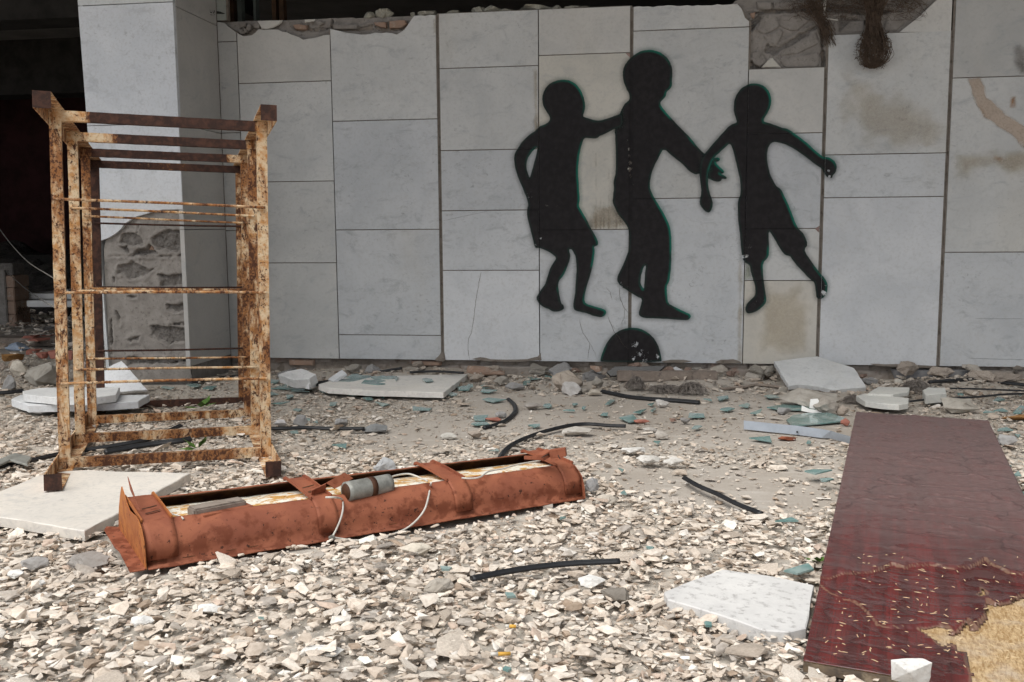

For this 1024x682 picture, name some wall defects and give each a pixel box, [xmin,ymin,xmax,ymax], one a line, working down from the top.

spalling [222,16,413,39]
spalling [733,0,867,69]
spalling [881,0,936,33]
leakage [969,78,1024,146]
spalling [53,195,332,385]
spalling [359,352,780,378]
spalling [846,364,1024,379]